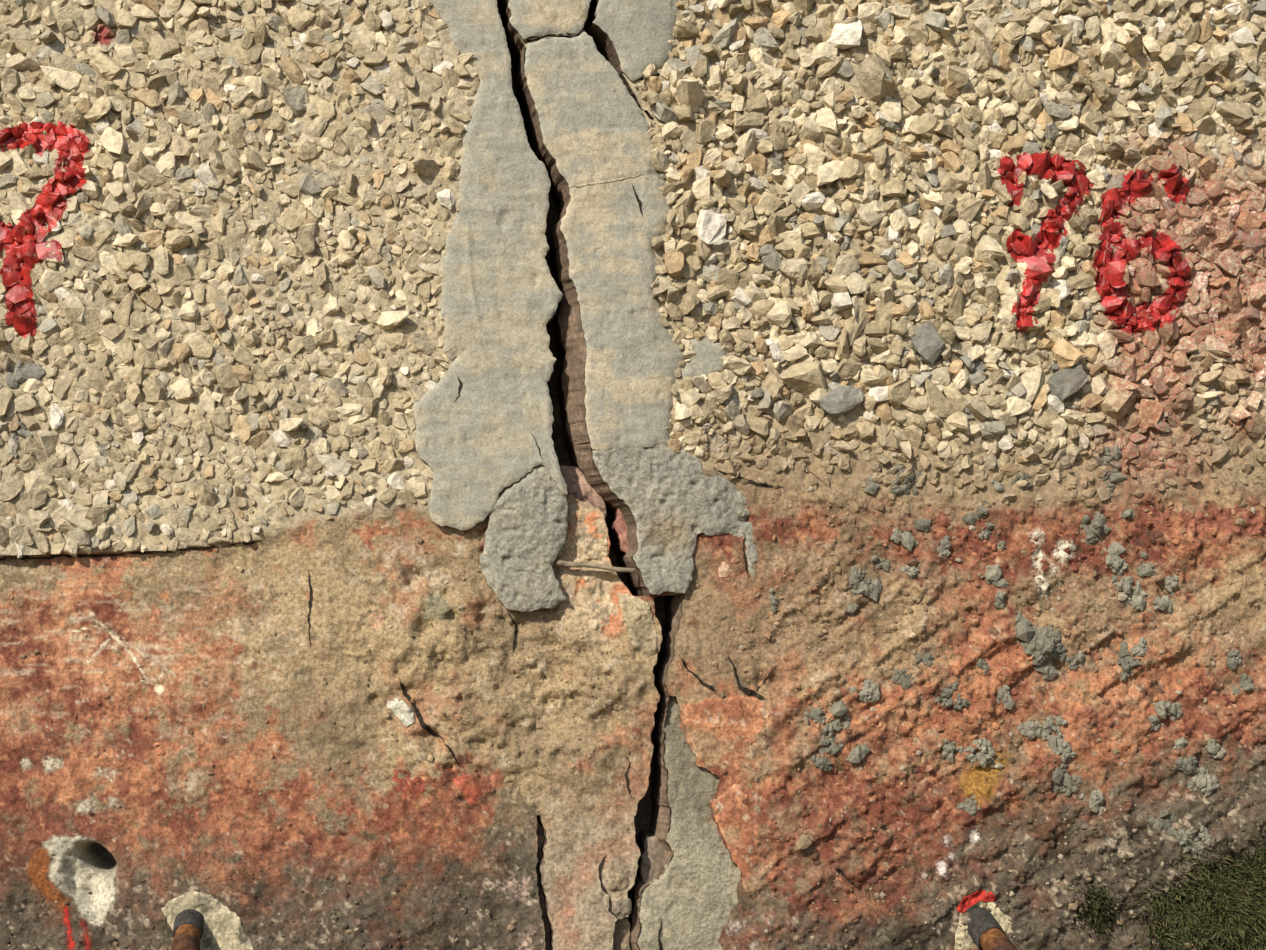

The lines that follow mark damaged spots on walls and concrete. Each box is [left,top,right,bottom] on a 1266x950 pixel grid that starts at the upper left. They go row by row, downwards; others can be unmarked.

crack [497,0,782,950]
rust [961,750,1011,803]
spalling [42,835,117,926]